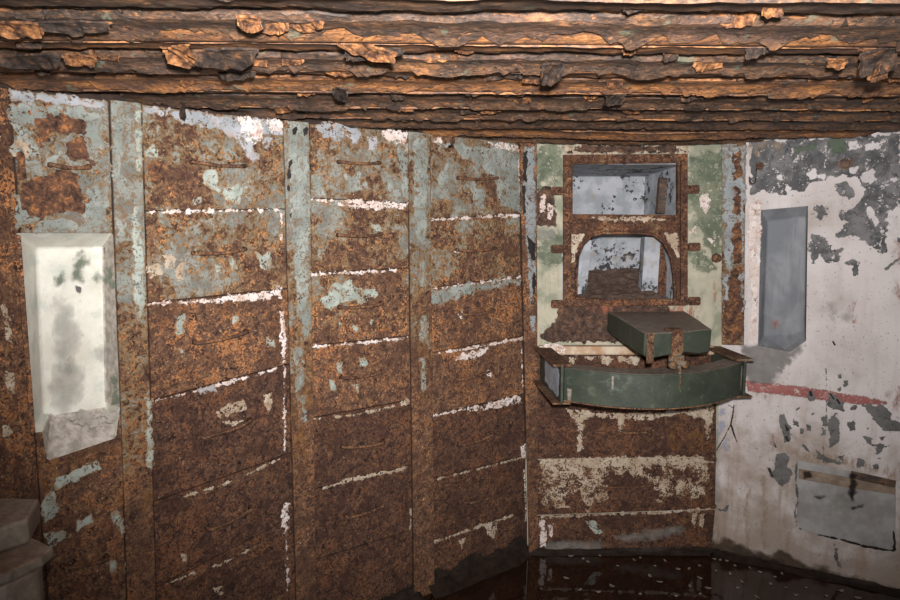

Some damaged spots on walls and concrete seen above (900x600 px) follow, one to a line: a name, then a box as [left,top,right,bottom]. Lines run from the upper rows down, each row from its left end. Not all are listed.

peeling [5,88,585,426]
corrosion [0,0,900,342]
peeling [664,132,900,312]
peeling [0,303,13,343]
peeling [144,376,248,470]
peeling [244,393,287,476]
peeling [433,443,526,482]
peeling [538,360,715,548]
spalling [767,374,900,486]